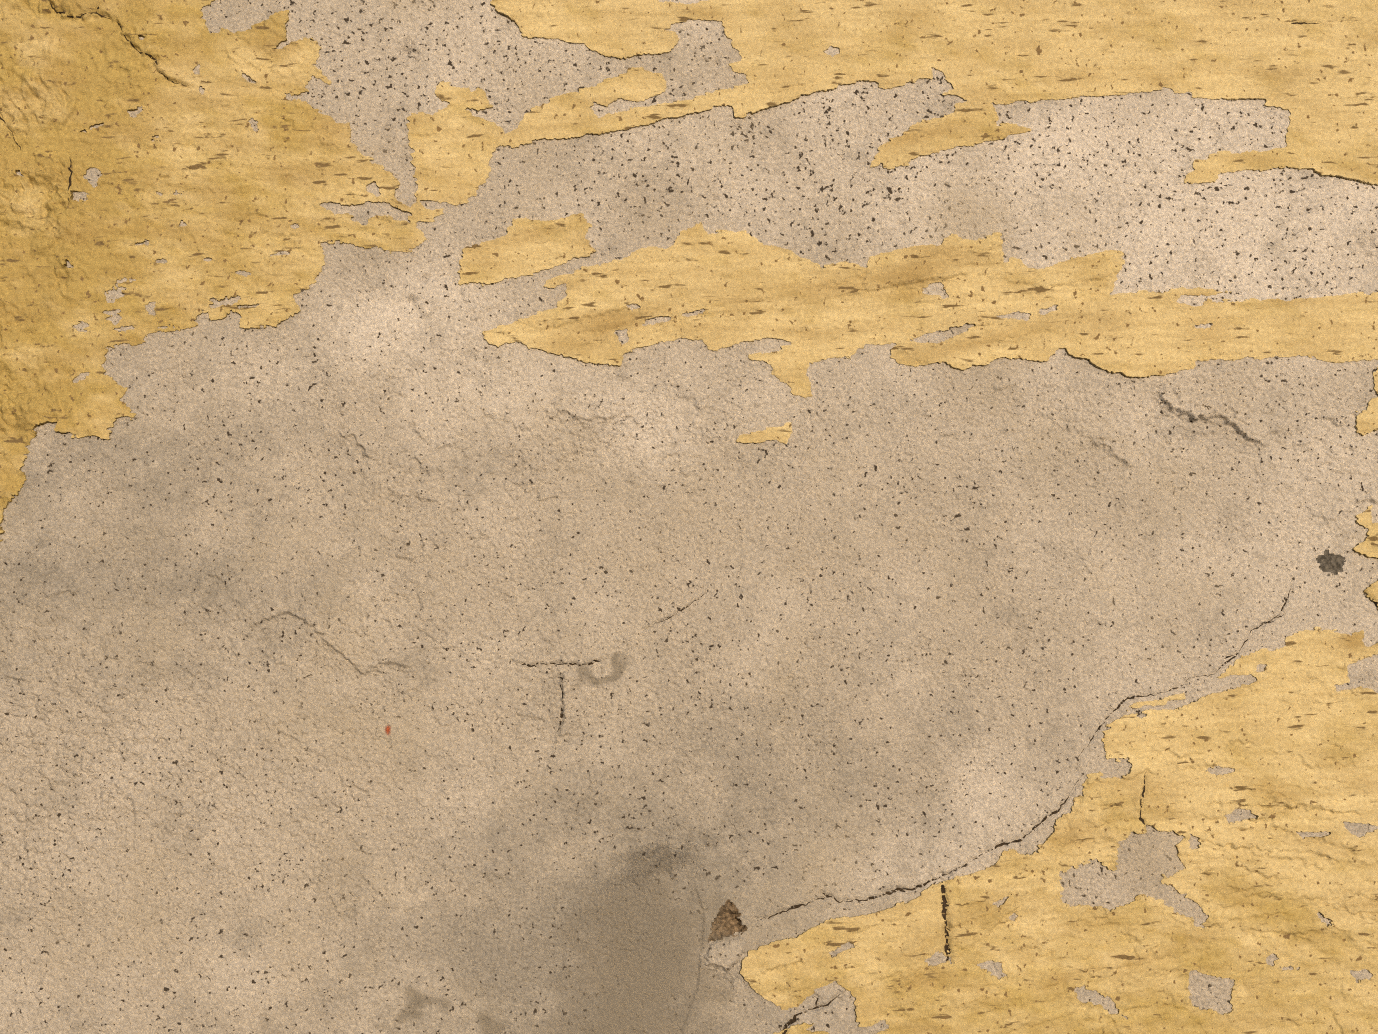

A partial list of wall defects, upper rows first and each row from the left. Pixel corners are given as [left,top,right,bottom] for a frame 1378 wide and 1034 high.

peeling [201,0,749,208]
peeling [504,66,934,148]
peeling [1184,147,1290,184]
peeling [457,213,596,287]
peeling [482,222,1378,398]
spalling [1316,549,1345,575]
spalling [243,619,364,679]
spalling [541,673,564,736]
crack [760,589,1291,960]
peeling [1054,774,1146,871]
peeling [1059,825,1193,918]
peeling [740,882,952,1010]